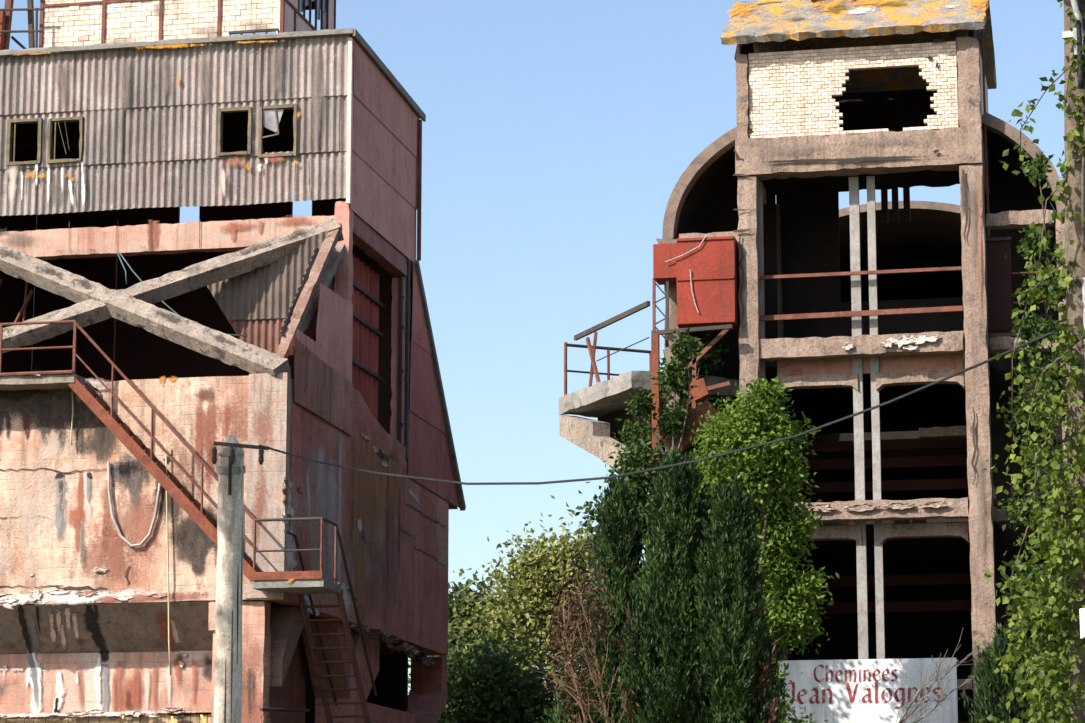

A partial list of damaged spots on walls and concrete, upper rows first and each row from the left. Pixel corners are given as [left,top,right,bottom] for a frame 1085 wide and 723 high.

efflorescence [9,163,85,205]
spalling [880,334,939,351]
water stain [0,389,217,576]
corrosion [69,487,160,578]
peeling [0,589,98,604]
water stain [0,596,65,714]
water stain [52,590,206,716]